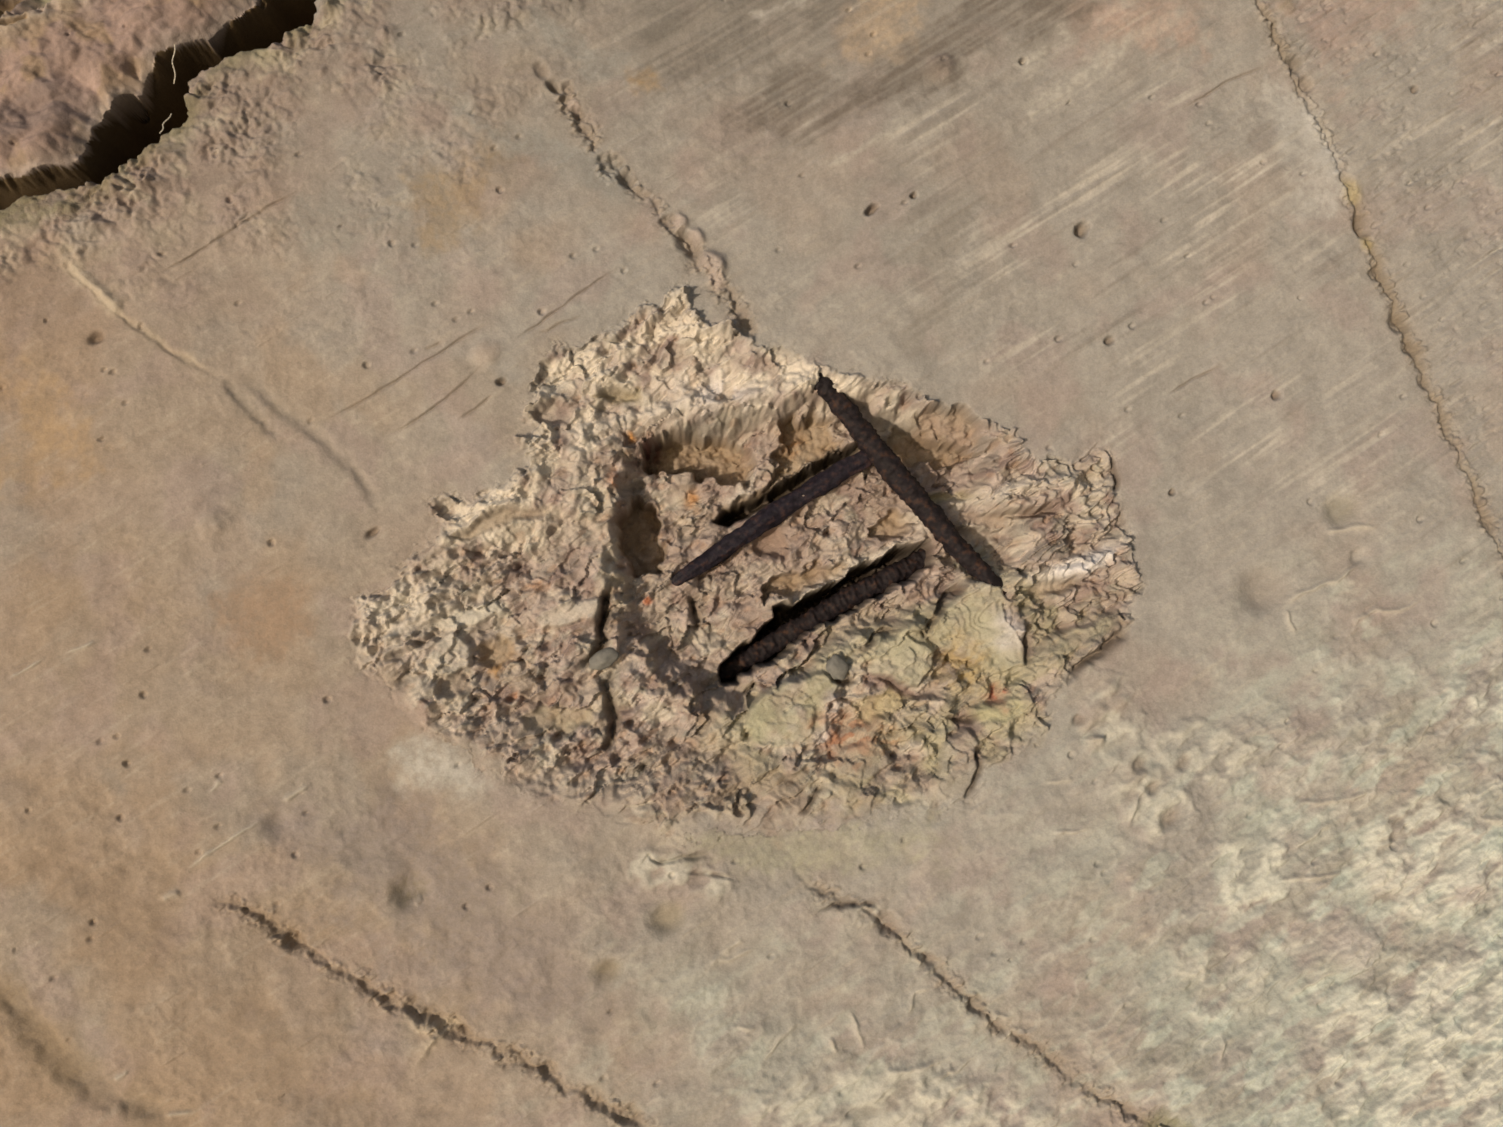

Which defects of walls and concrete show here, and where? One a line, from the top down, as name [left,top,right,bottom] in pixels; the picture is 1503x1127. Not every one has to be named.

crack [0,0,317,210]
crack [153,189,305,280]
spalling [348,283,1306,906]
crack [815,900,878,918]
peeling [838,902,903,939]
peeling [1164,939,1282,1005]